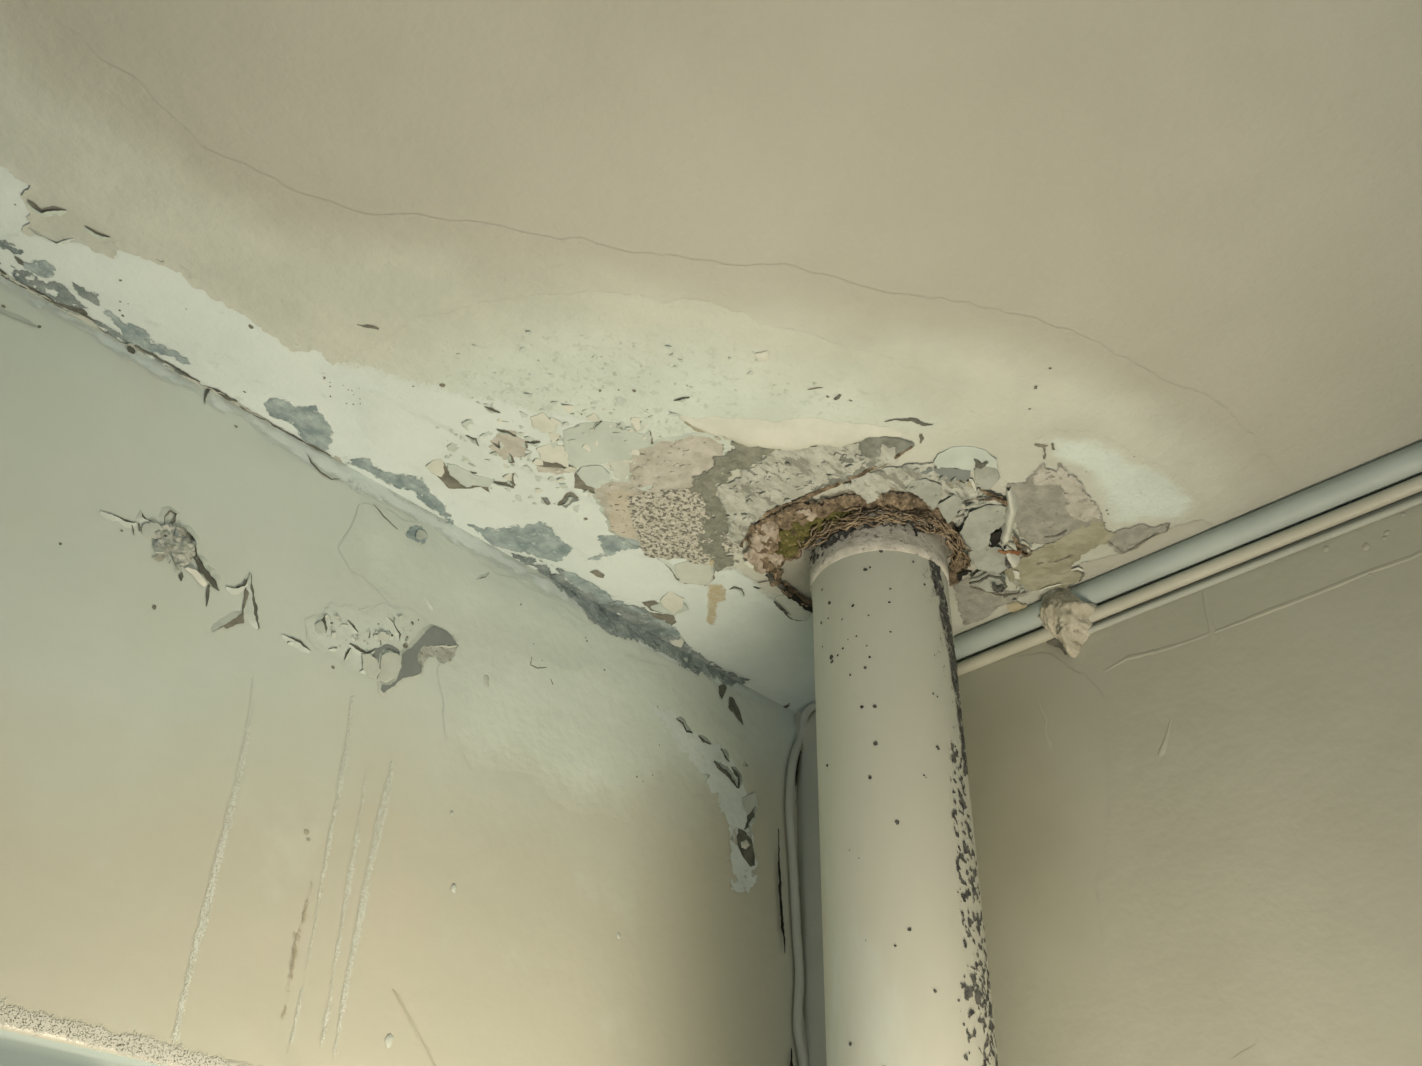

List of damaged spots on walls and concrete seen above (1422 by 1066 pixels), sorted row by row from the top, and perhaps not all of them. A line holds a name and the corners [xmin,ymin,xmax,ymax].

peeling [0,155,1212,724]
peeling [652,706,759,893]